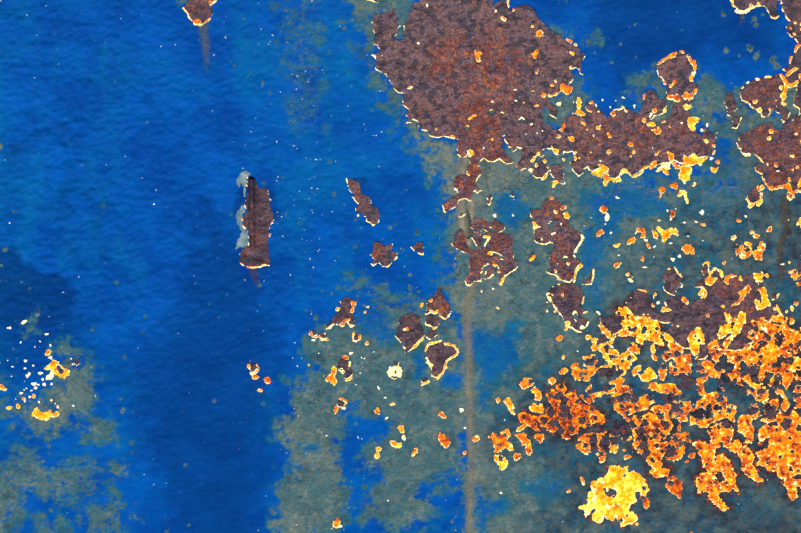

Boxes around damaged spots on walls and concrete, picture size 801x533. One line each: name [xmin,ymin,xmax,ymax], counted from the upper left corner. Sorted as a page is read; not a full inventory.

rust [182,0,216,40]
peeling [235,171,251,249]
rust [239,177,274,269]
rust [346,178,380,226]
rust [371,0,801,529]
rust [309,297,369,345]
rust [44,350,79,379]
rust [6,394,60,421]